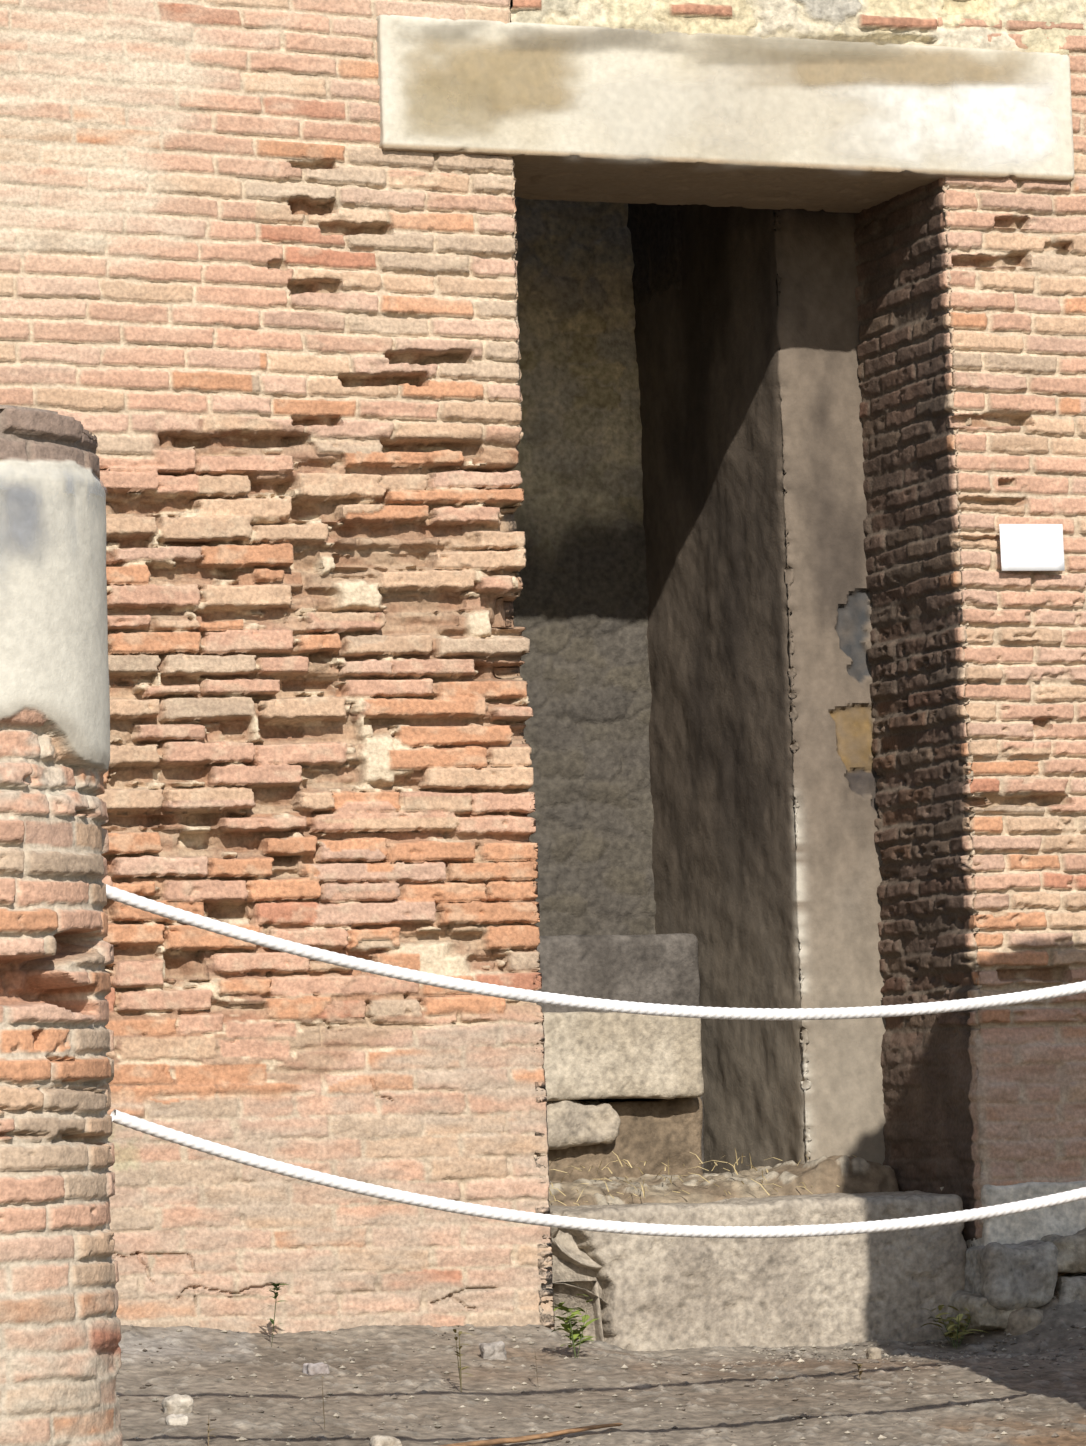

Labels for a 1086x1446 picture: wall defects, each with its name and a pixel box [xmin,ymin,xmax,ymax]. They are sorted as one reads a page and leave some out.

spalling [290,162,339,171]
spalling [289,198,396,236]
spalling [268,260,343,296]
spalling [340,352,474,388]
spalling [0,418,544,1028]